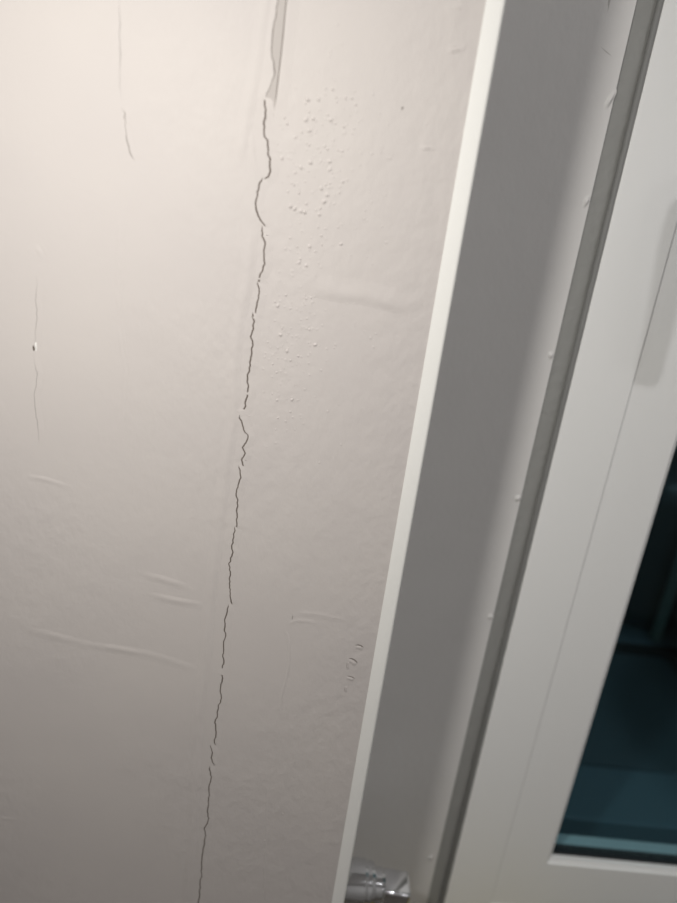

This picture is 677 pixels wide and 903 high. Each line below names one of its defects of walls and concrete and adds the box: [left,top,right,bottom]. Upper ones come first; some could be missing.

crack [198,97,279,903]